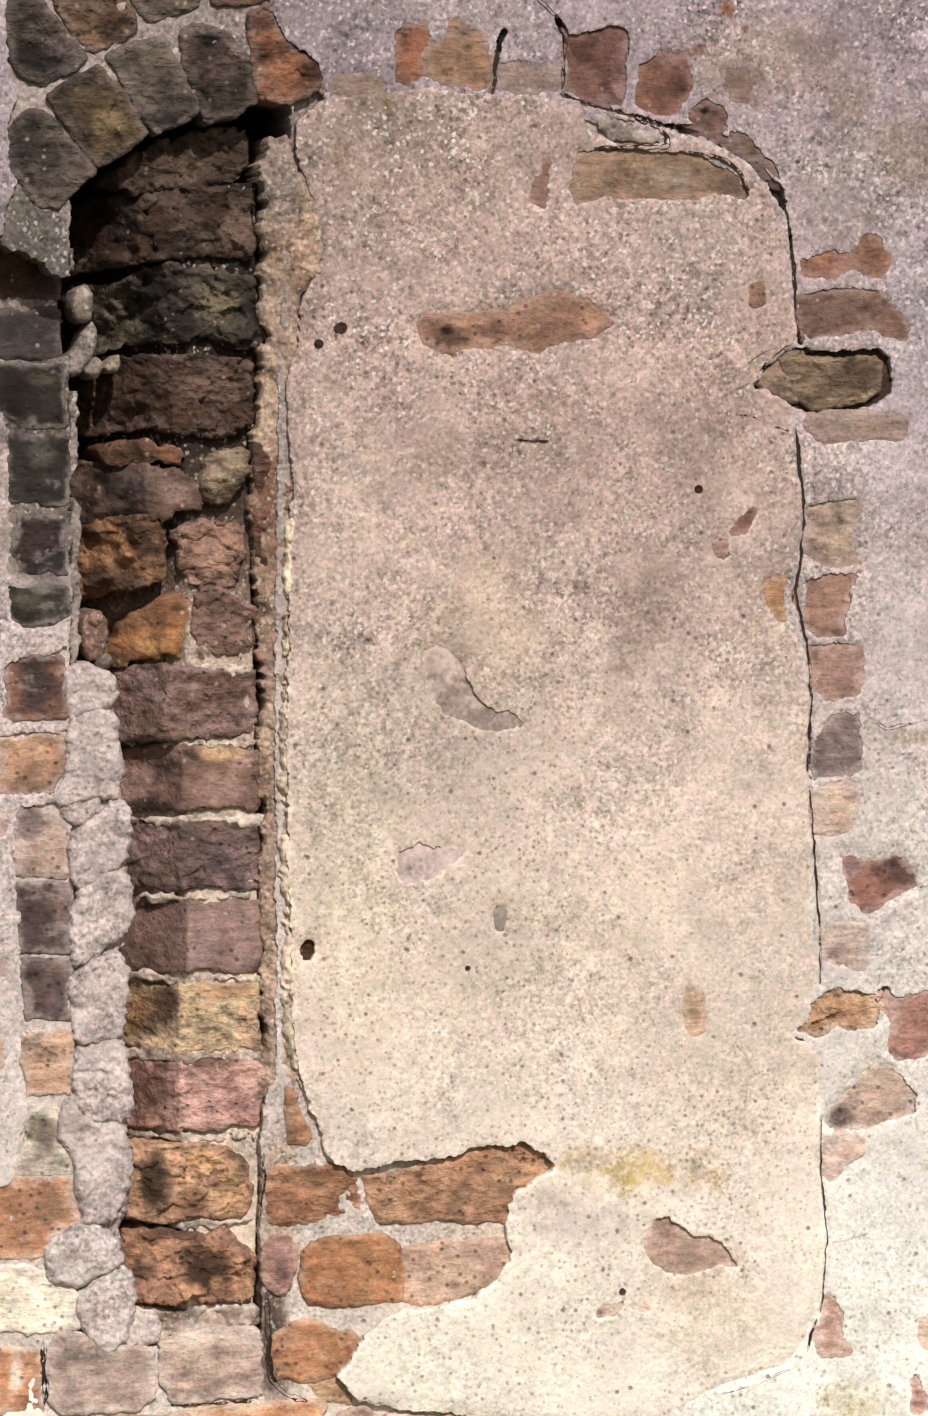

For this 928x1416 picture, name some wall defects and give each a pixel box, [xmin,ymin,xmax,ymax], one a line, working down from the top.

crack [492,33,504,92]
peeling [317,17,783,209]
peeling [754,233,911,444]
crack [517,437,548,445]
crack [537,0,822,984]
peeling [423,646,523,732]
peeling [761,499,865,837]
peeling [817,853,916,971]
peeling [795,986,928,1182]
peeling [257,1086,552,1416]
peeling [643,1216,737,1275]
peeling [812,1292,853,1359]